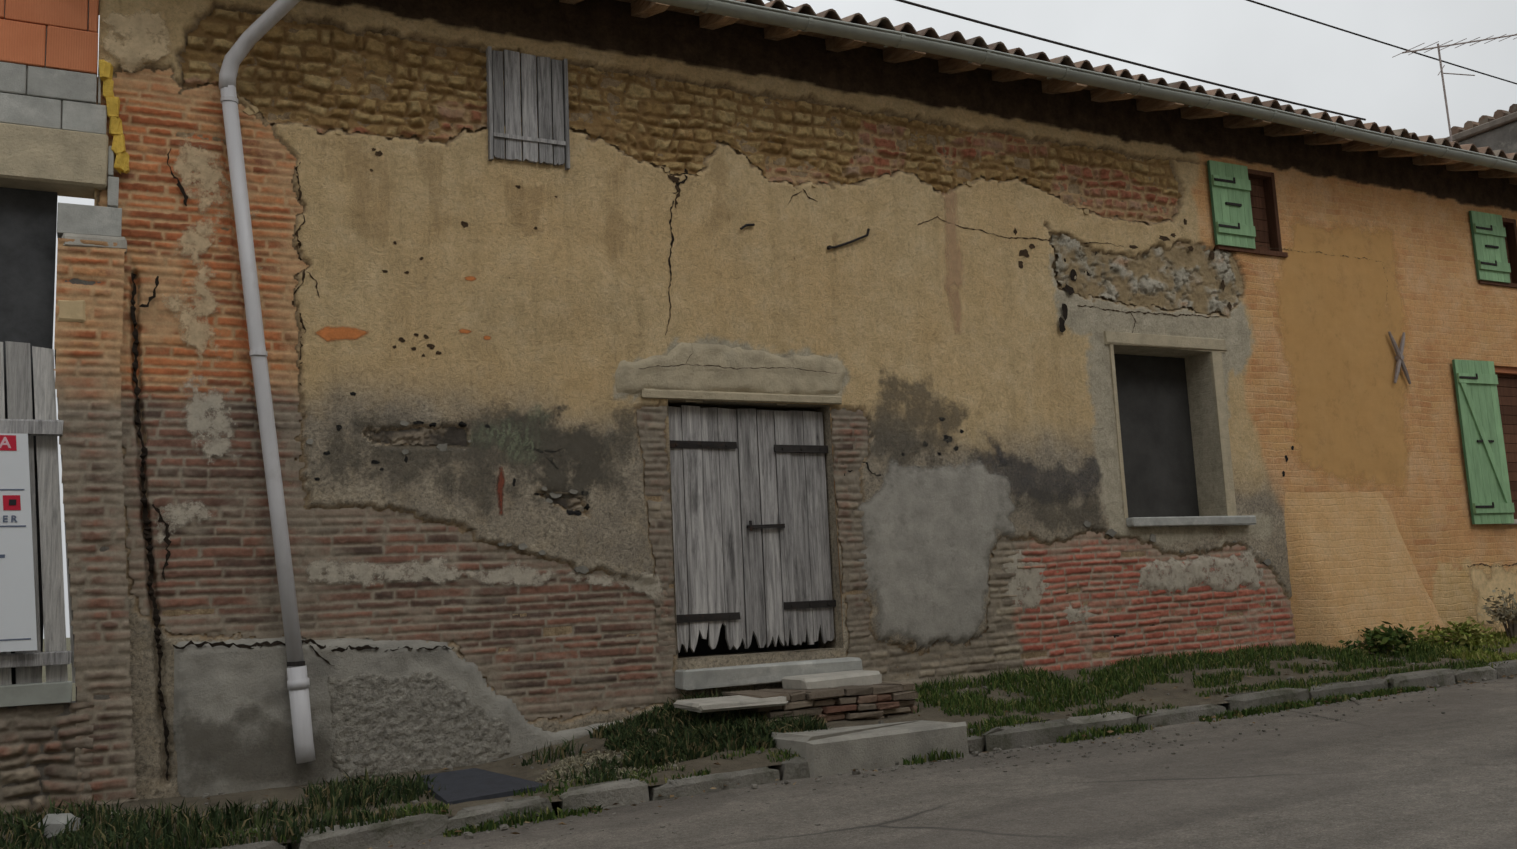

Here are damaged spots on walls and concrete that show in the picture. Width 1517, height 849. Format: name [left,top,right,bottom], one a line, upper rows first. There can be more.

crack [130,273,454,781]
peeling [96,8,1215,780]
crack [639,167,838,374]
peeling [830,408,1296,687]